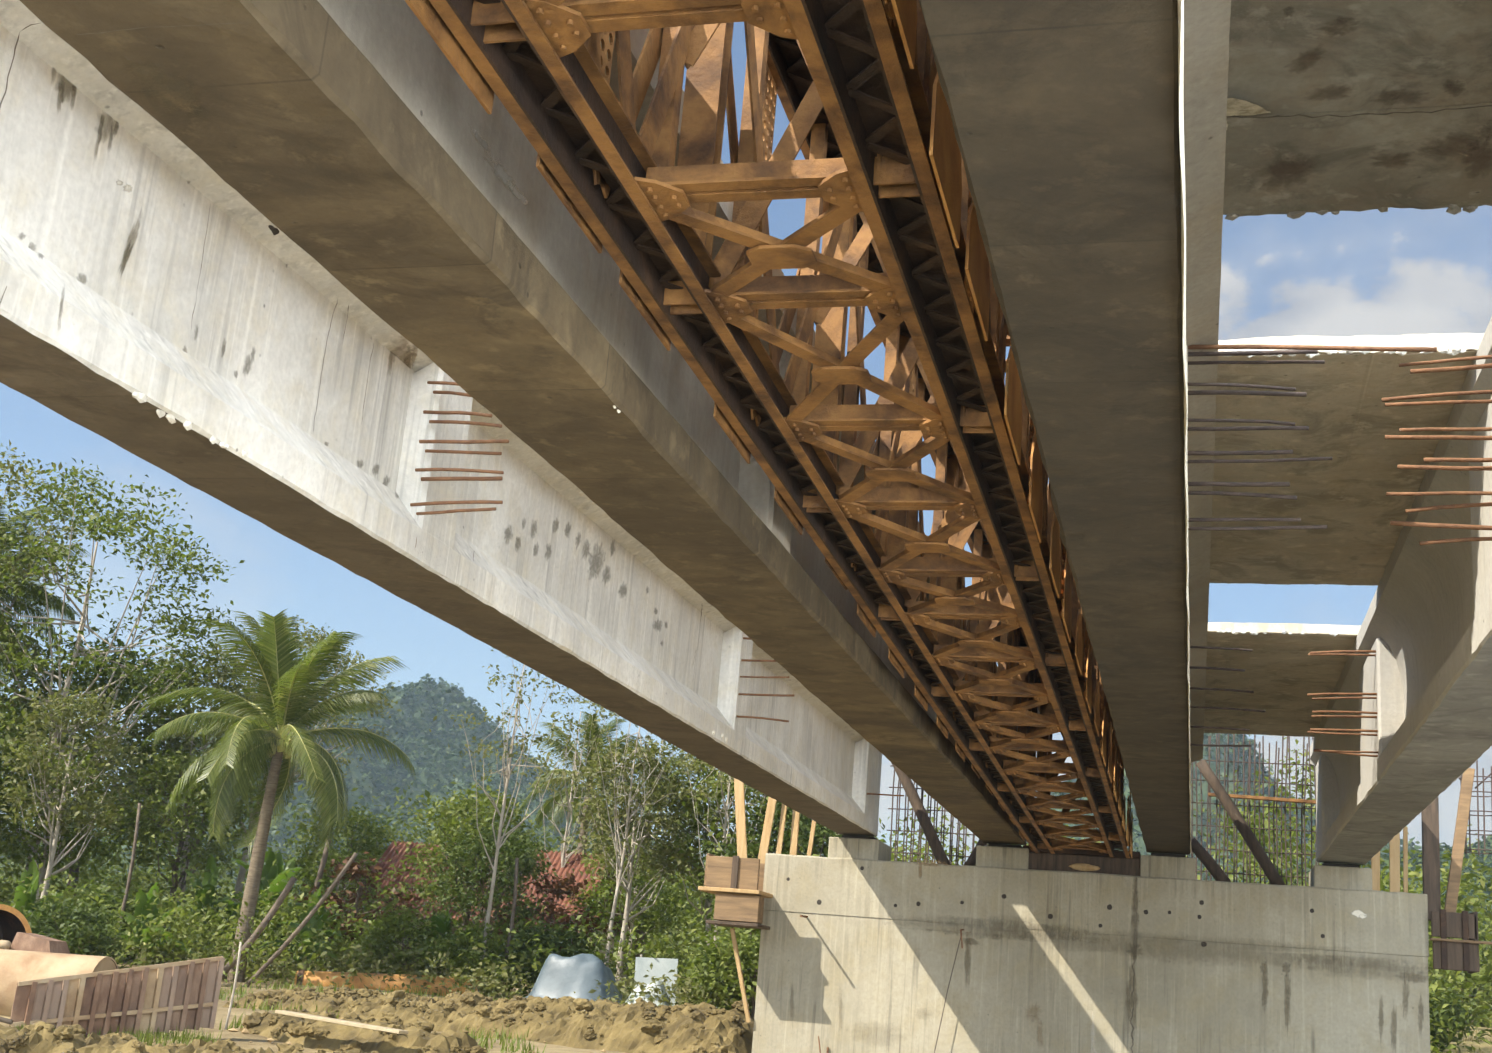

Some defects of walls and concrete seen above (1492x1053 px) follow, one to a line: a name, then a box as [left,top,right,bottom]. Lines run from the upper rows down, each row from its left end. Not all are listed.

crack [0,23,39,108]
damp [53,68,75,104]
damp [123,232,135,268]
damp [554,522,613,582]